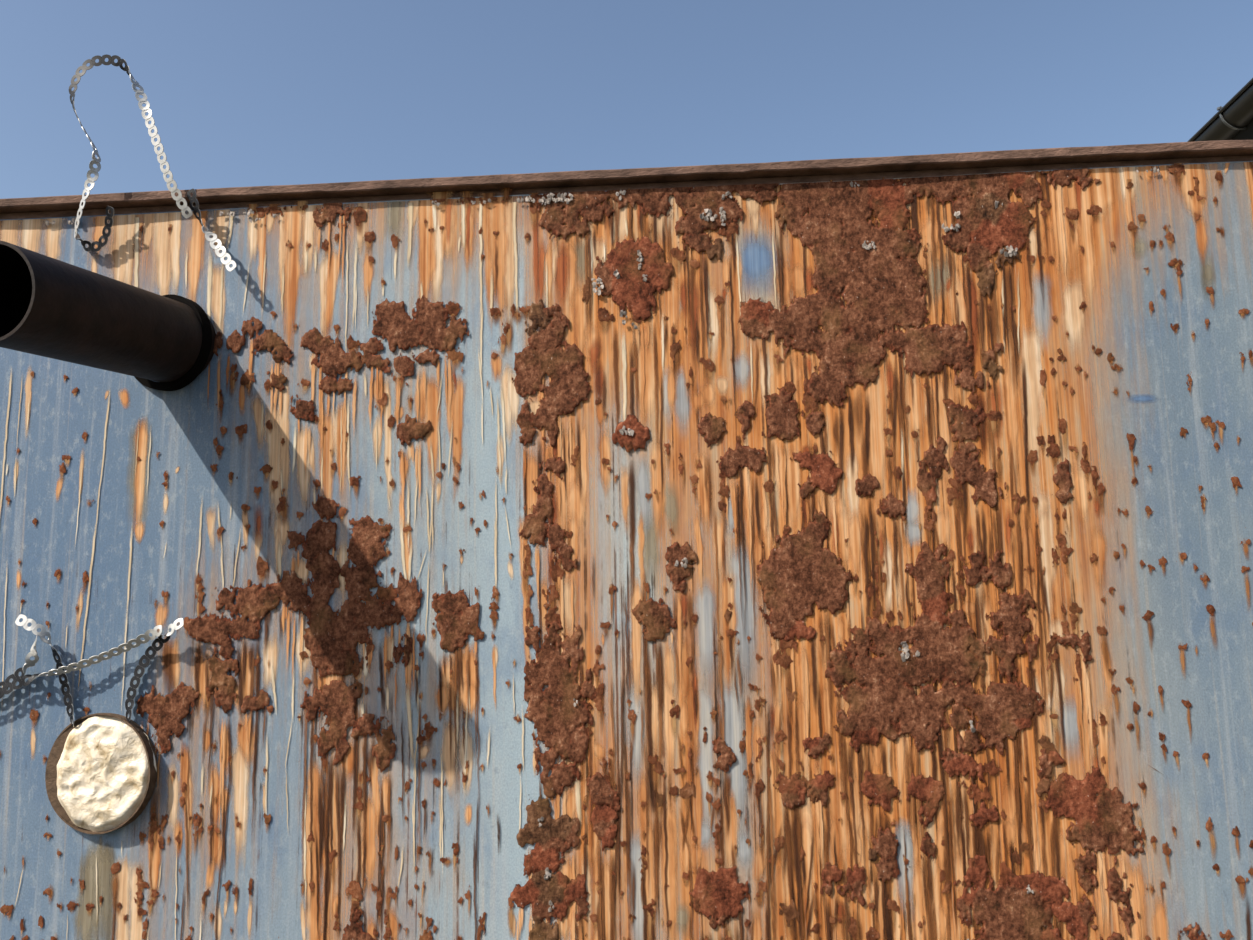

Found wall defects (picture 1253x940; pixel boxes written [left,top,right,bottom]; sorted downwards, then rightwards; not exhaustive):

rust [1244,162,1253,220]
rust [0,217,78,259]
rust [0,371,34,513]
rust [1201,415,1241,451]
rust [38,163,1234,940]
rust [1240,539,1251,603]
rust [2,559,27,687]
rust [30,692,51,763]
rust [1232,826,1253,854]
rust [0,858,28,940]
rust [1235,868,1253,940]